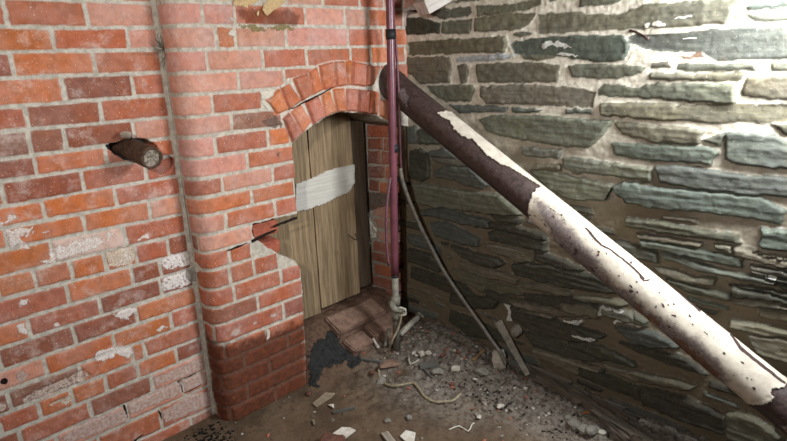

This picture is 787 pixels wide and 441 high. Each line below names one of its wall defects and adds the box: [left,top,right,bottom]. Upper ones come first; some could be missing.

peeling [228,0,294,36]
water stain [0,214,49,249]
water stain [41,232,113,264]
spalling [252,219,280,252]
water stain [160,252,191,291]
water stain [63,323,306,441]